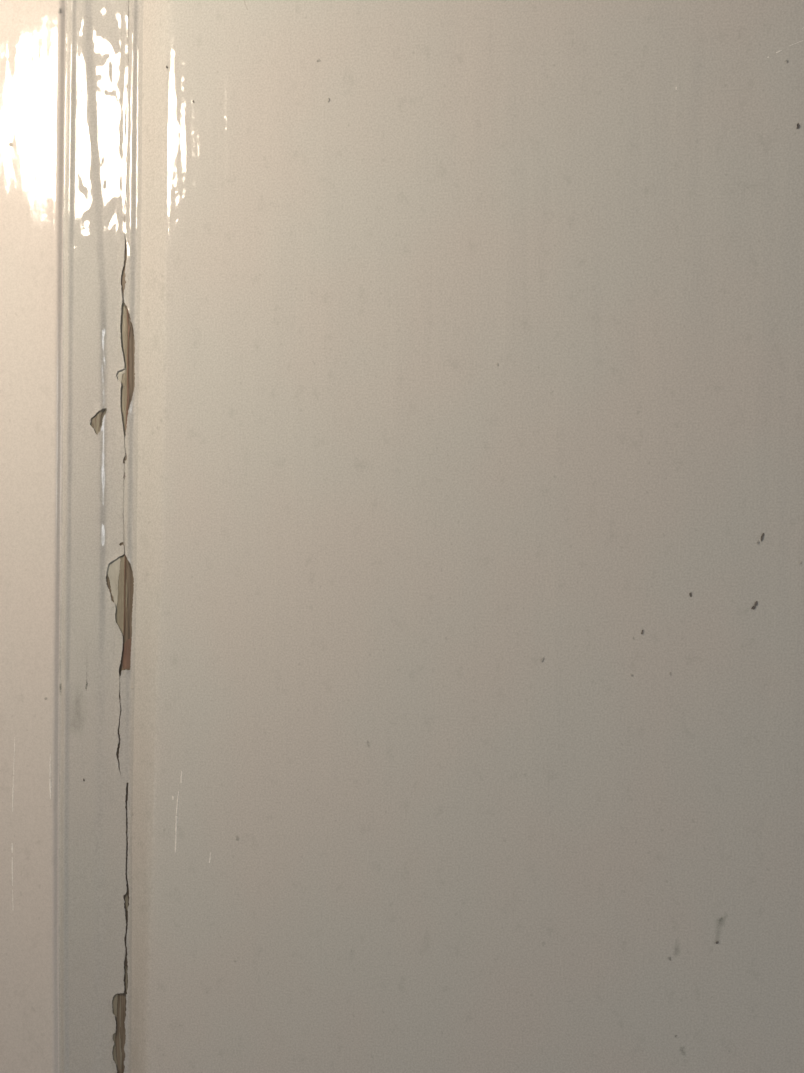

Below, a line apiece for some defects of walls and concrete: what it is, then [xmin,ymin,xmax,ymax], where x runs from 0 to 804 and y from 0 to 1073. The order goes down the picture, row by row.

peeling [90,408,107,435]
peeling [117,303,135,436]
peeling [106,554,134,676]
crack [116,693,129,994]
peeling [112,993,126,1073]